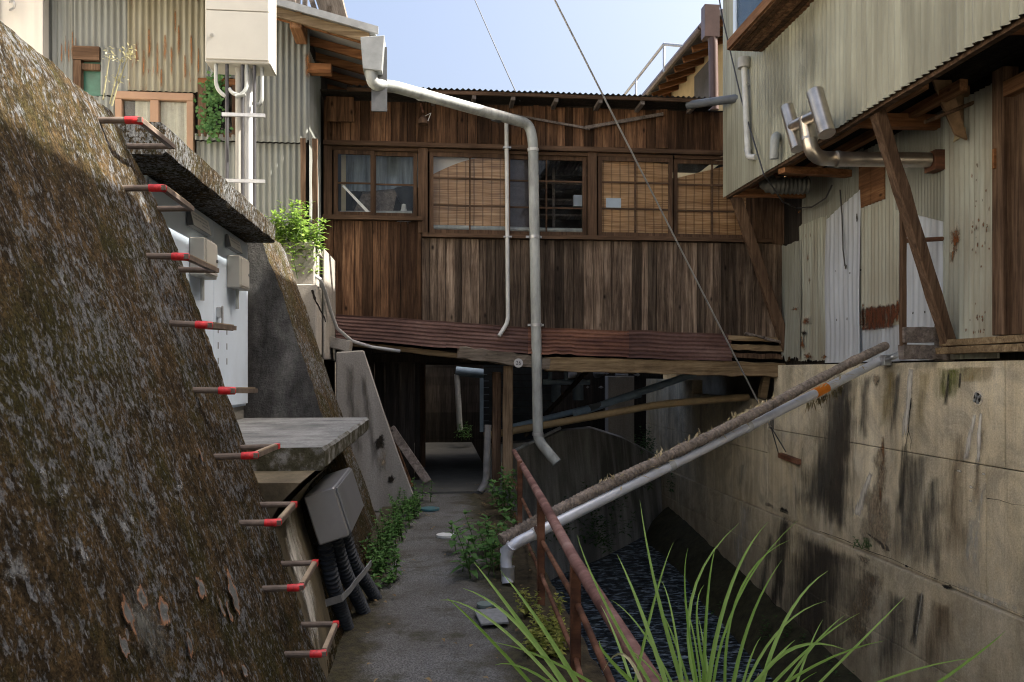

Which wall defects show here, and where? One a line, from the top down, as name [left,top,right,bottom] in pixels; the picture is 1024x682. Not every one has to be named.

corrosion [950,190,990,261]
corrosion [859,301,899,331]
water stain [803,381,871,524]
water stain [884,370,934,556]
peeling [119,584,170,658]
peeling [196,569,241,622]
water stain [762,518,850,640]
water stain [880,594,946,663]